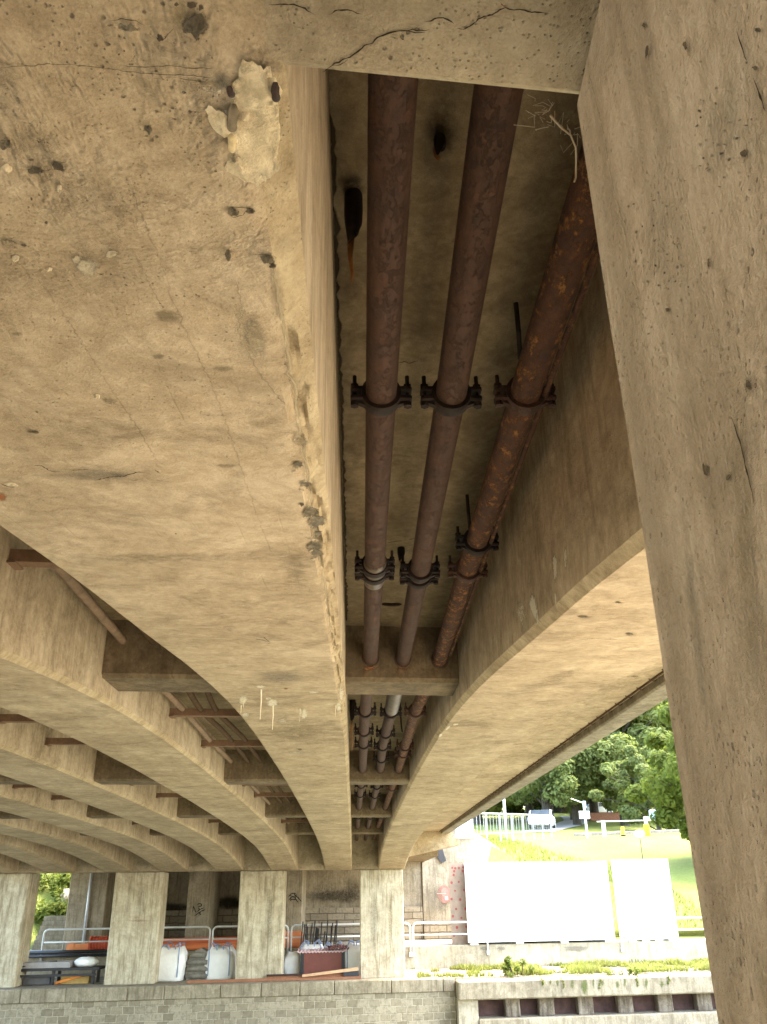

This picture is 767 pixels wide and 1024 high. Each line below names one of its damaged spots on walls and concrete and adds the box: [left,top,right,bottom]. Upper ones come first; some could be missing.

crack [323,4,548,72]
spalling [205,59,283,187]
crack [2,465,160,487]
spalling [236,253,334,649]
crack [732,420,754,502]
efflorescence [239,685,284,730]